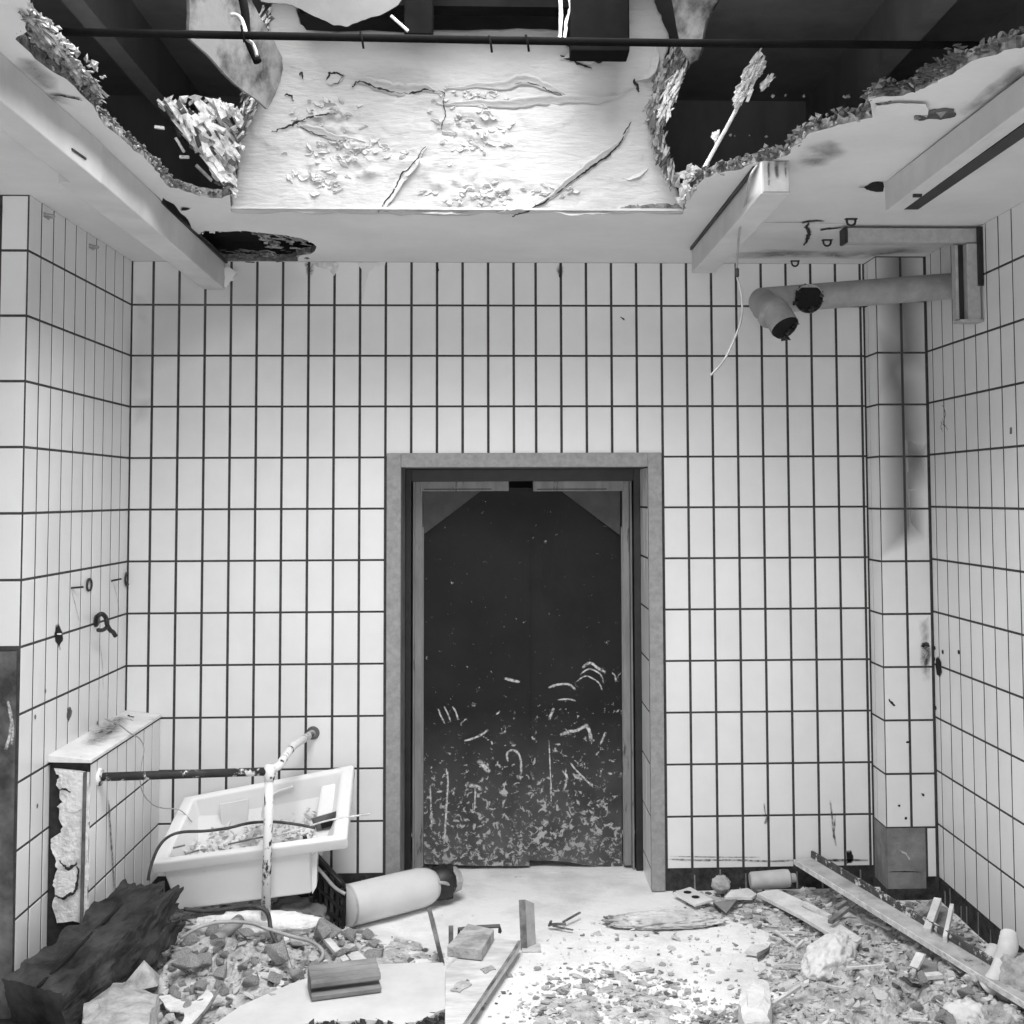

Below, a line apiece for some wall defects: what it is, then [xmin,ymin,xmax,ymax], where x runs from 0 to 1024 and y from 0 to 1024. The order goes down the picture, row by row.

flaking render [16,8,107,79]
spalling [259,5,275,32]
spalling [46,58,258,202]
crack [272,113,365,142]
spalling [285,26,1024,208]
crack [378,147,427,213]
peeling [385,180,580,215]
crack [512,122,631,217]
spalling [190,225,314,263]
water stain [890,303,920,528]
flaking render [47,762,92,946]